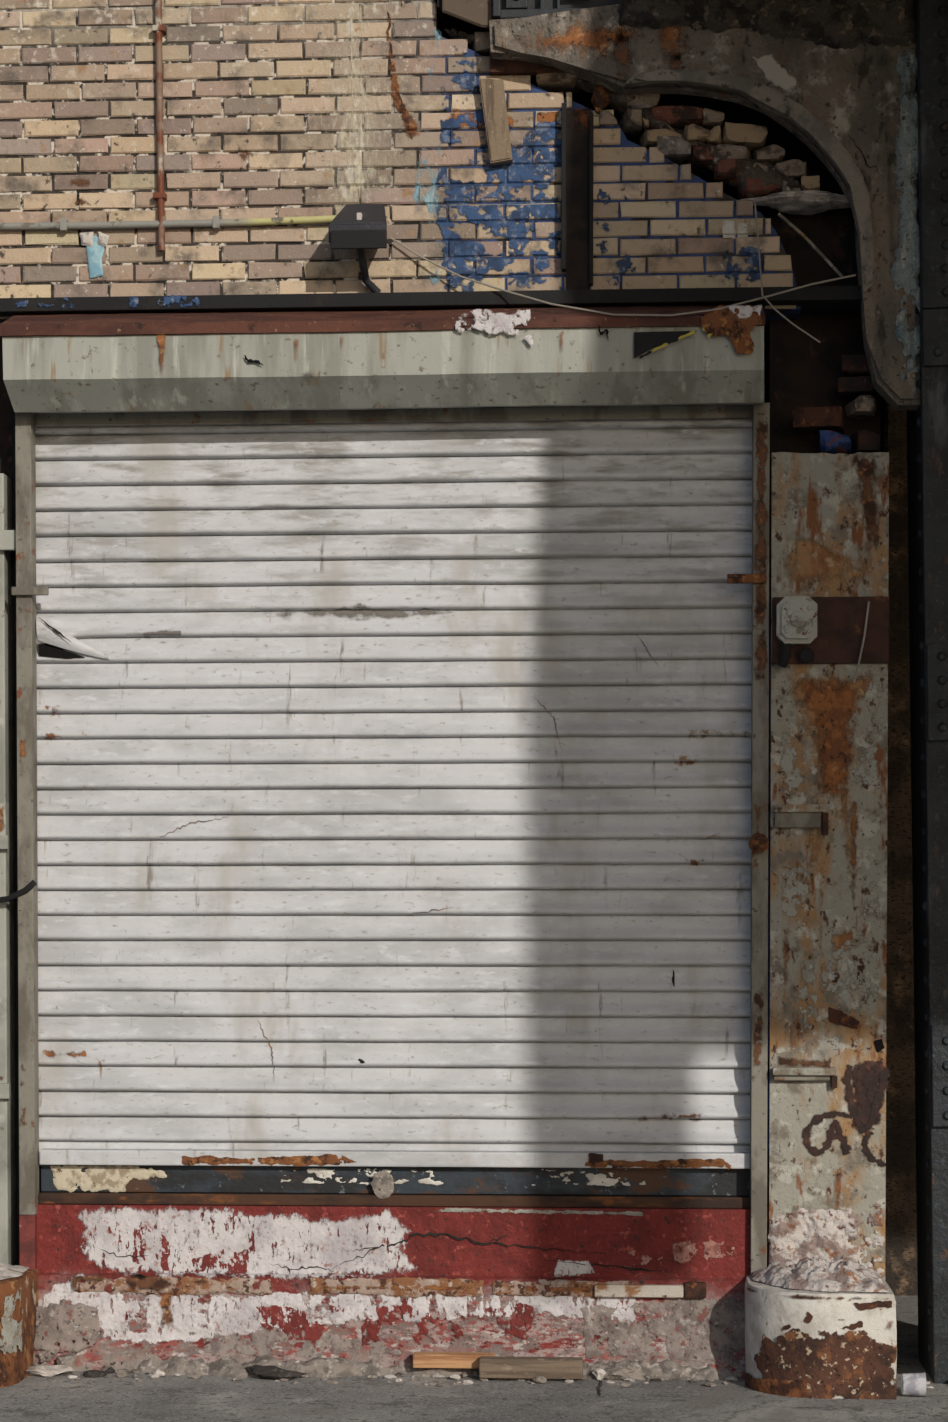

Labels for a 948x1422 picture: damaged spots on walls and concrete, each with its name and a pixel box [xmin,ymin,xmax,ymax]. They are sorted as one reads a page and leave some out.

rust [537,24,635,76]
peeling [435,28,562,292]
spalling [536,72,803,199]
peeling [618,0,920,381]
peeling [455,309,533,346]
rust [701,304,763,355]
rust [754,413,889,879]
rust [182,1154,356,1167]
peeling [42,1165,746,1367]
spalling [768,1203,885,1274]
peeling [0,1287,23,1355]
rust [745,1328,897,1400]